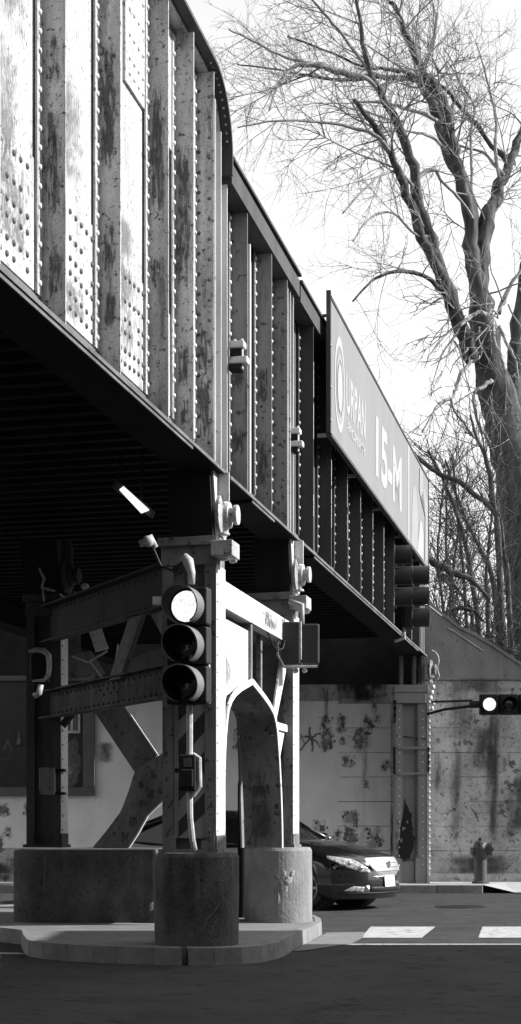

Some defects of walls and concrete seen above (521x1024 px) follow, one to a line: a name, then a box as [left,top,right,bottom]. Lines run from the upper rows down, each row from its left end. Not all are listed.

rust [42,36,83,212]
rust [100,50,117,167]
rust [149,90,190,282]
rust [49,250,83,319]
rust [104,216,135,351]
rust [178,326,212,441]
rust [233,429,243,454]
rust [258,370,267,401]
rust [257,441,268,486]
damp [477,723,498,833]